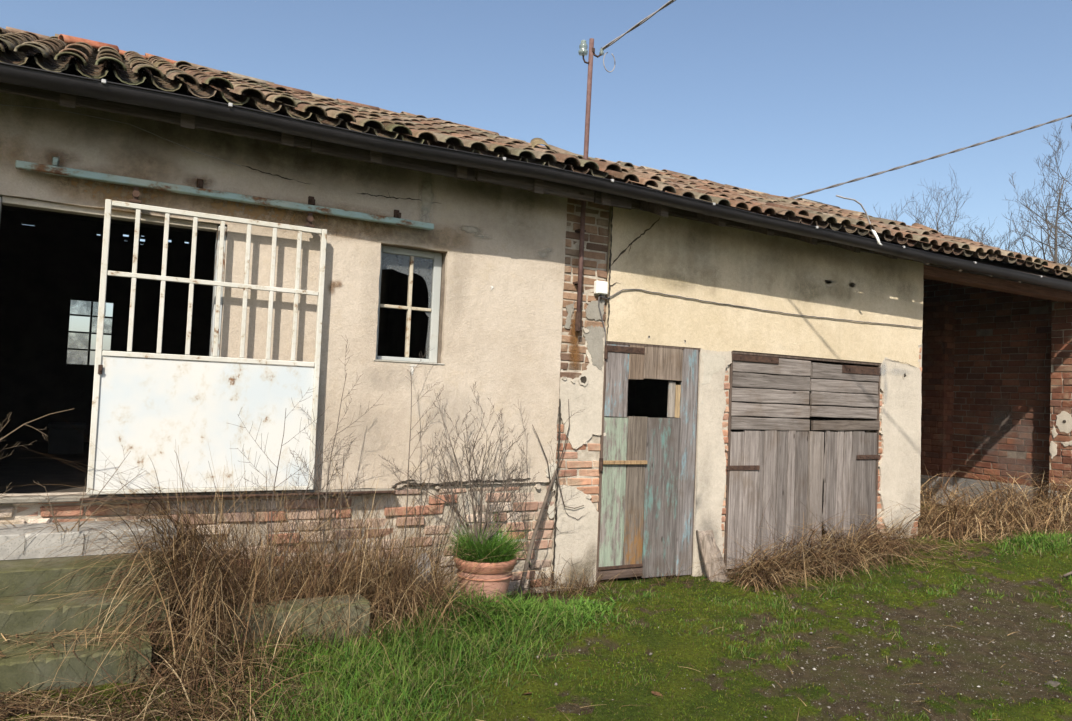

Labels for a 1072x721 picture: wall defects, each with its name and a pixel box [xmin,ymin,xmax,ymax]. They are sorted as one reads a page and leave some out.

spalling [560,198,609,386]
crack [607,206,660,334]
spalling [0,412,606,600]
peeling [1050,411,1072,459]